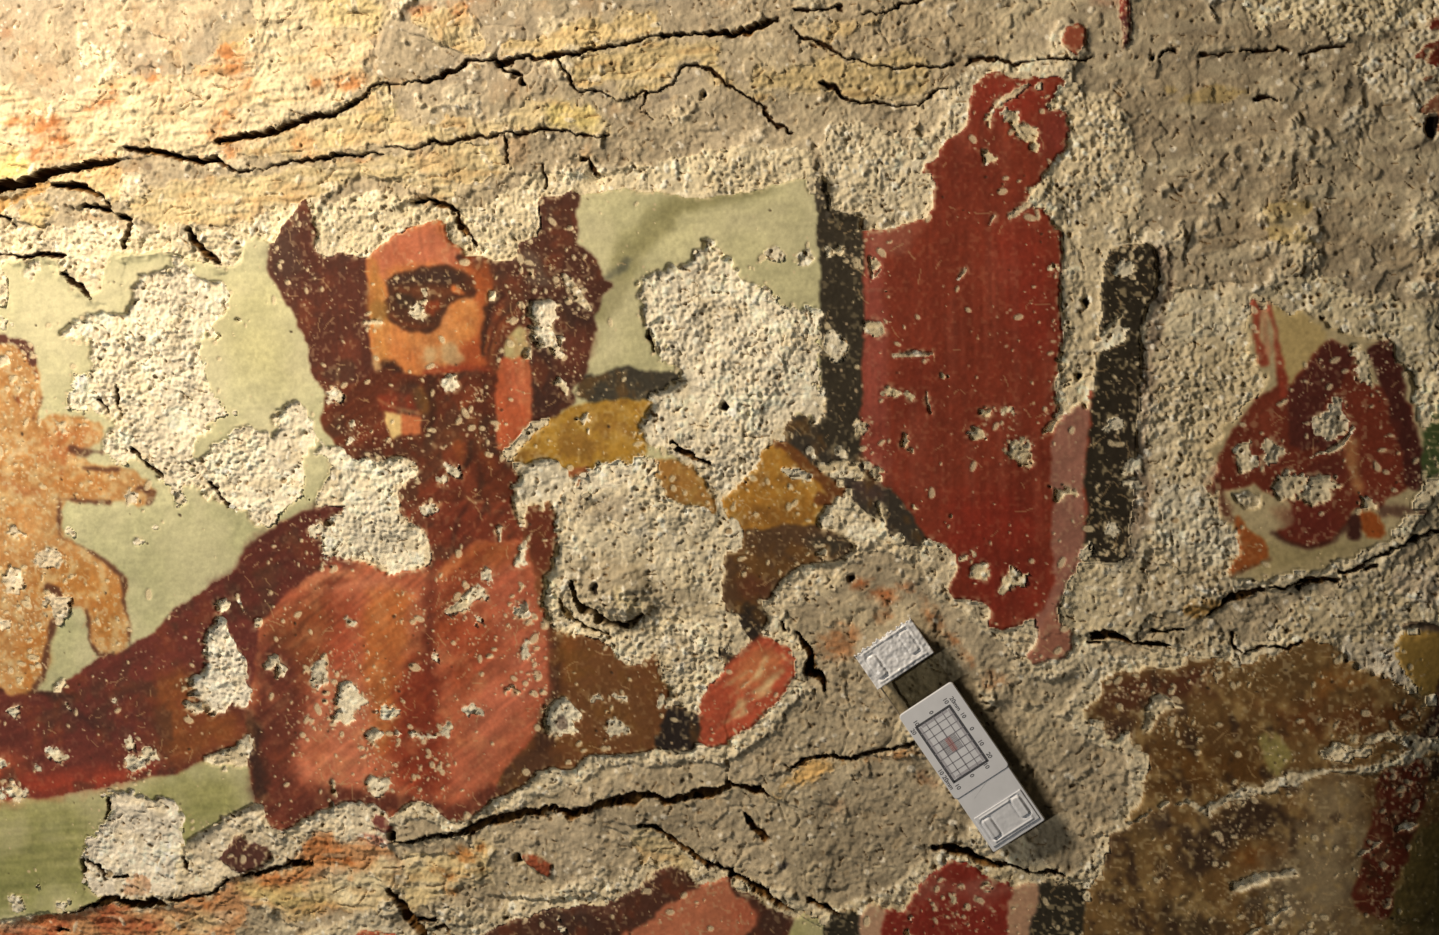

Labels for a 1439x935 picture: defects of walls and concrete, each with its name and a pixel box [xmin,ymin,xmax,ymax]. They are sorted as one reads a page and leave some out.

spalling [1241,0,1439,117]
crack [0,0,1093,300]
spalling [0,0,969,576]
spalling [1008,82,1145,470]
spalling [511,239,849,716]
spalling [1058,269,1439,645]
crack [1087,530,1439,655]
spalling [1265,557,1439,686]
crack [792,741,916,769]
spalling [0,776,1090,935]
crack [395,780,840,918]
crack [931,843,1066,878]